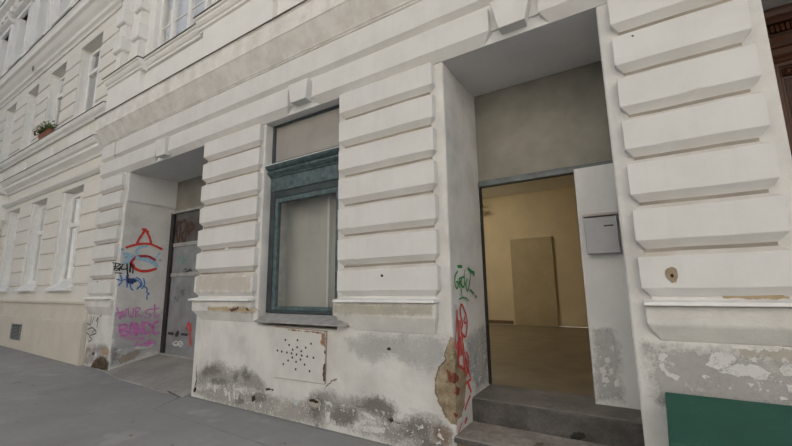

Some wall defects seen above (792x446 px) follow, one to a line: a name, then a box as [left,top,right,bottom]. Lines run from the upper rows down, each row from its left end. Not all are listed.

spalling [665,267,678,283]
spalling [90,344,153,371]
spalling [434,337,487,425]
peeling [702,348,792,400]
water stain [311,394,452,446]